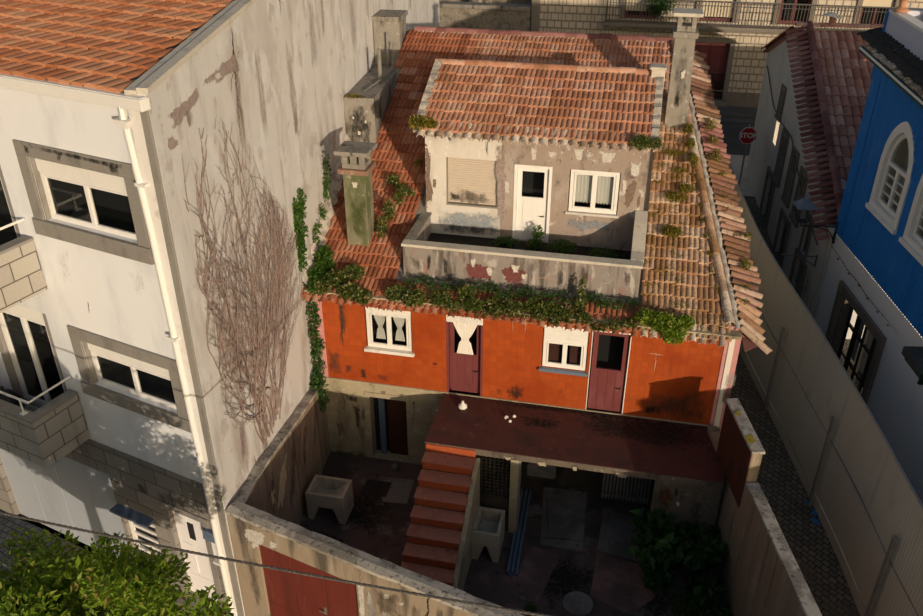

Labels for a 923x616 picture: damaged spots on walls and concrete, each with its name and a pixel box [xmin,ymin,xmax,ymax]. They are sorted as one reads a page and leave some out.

peeling [206,55,239,83]
crack [231,28,245,135]
peeling [168,89,198,149]
peeling [623,162,641,218]
peeling [466,259,527,285]
water stain [507,390,692,446]